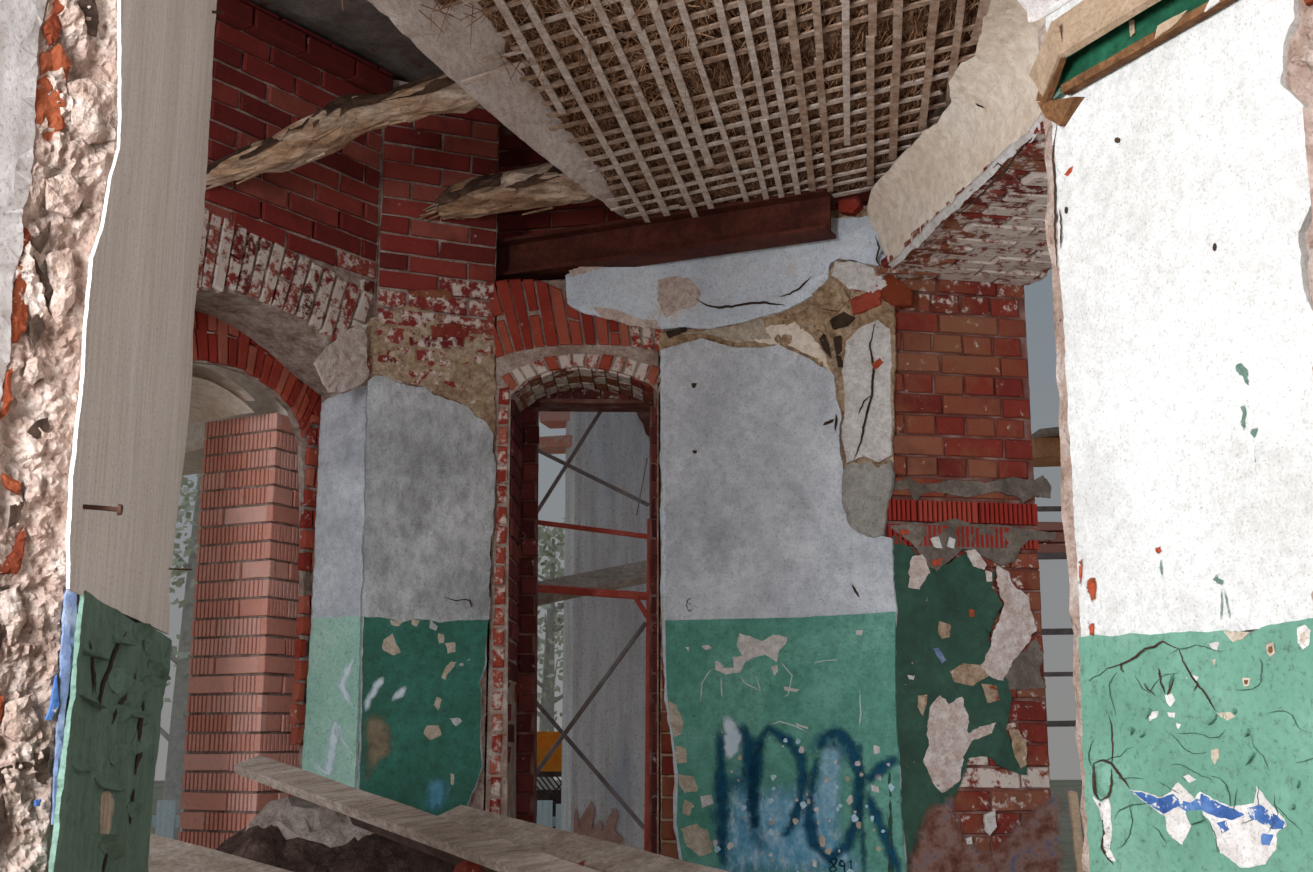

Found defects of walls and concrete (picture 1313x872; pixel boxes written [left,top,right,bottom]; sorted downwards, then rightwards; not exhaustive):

flaking render [1286,0,1313,304]
flaking render [0,0,171,872]
flaking render [366,289,496,436]
crack [696,276,812,309]
crack [823,324,875,461]
peeling [382,619,420,655]
peeling [686,633,800,692]
peeling [908,537,1037,793]
flaking render [1297,625,1311,650]
peeling [668,701,734,856]
peeling [792,745,895,872]
crack [1088,641,1313,865]